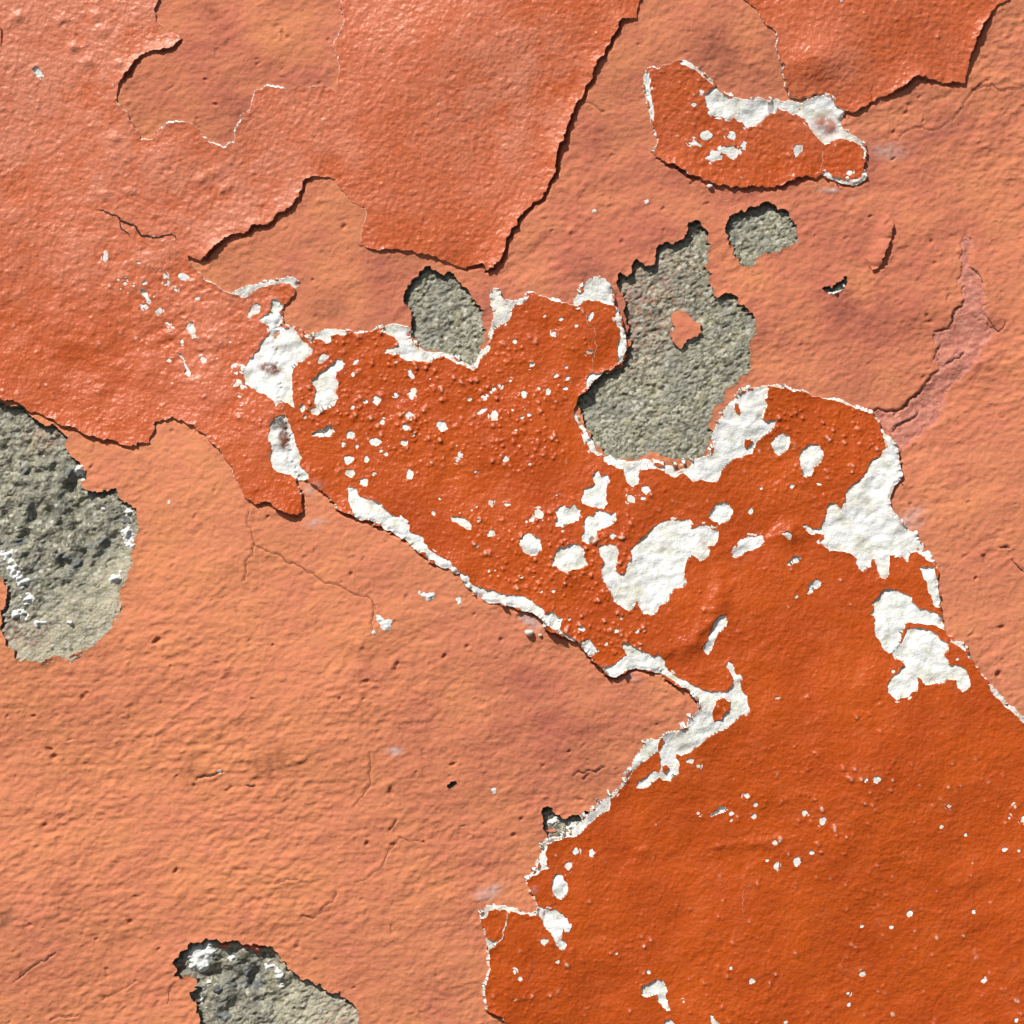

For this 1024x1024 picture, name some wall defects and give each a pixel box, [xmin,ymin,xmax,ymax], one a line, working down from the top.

peeling [642,0,1007,188]
crack [97,209,177,239]
spalling [725,201,799,268]
spalling [822,276,847,295]
peeling [712,697,730,722]
spalling [172,938,359,1024]